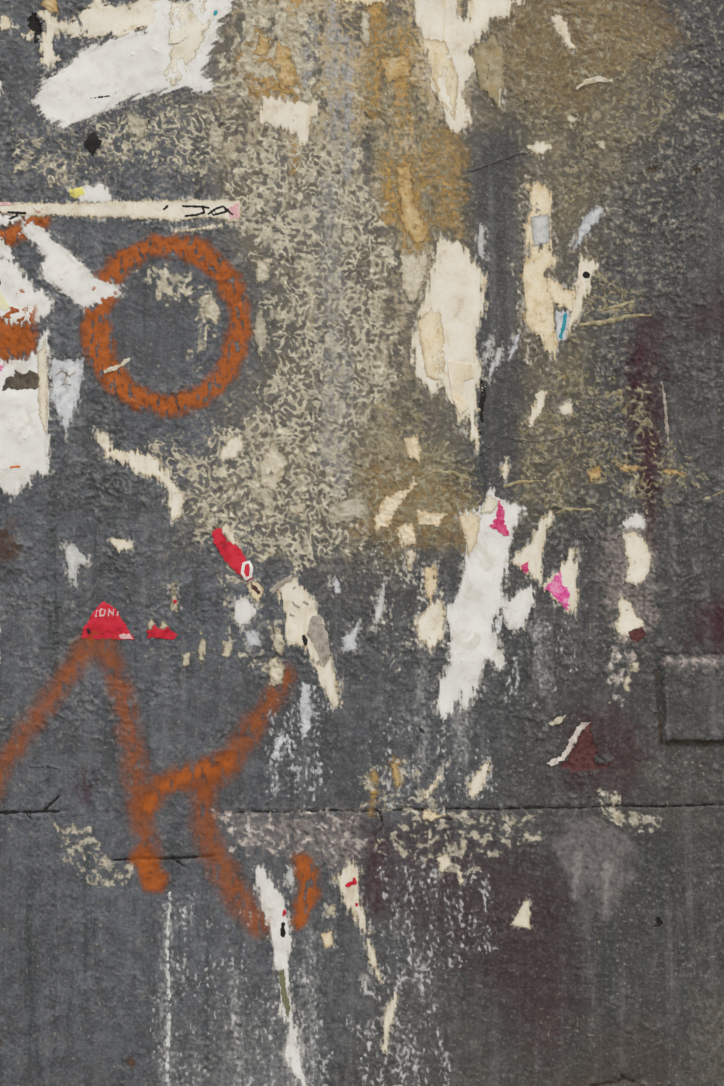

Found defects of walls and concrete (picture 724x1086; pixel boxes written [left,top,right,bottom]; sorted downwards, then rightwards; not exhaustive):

crack [0,794,60,819]
crack [591,1073,635,1086]